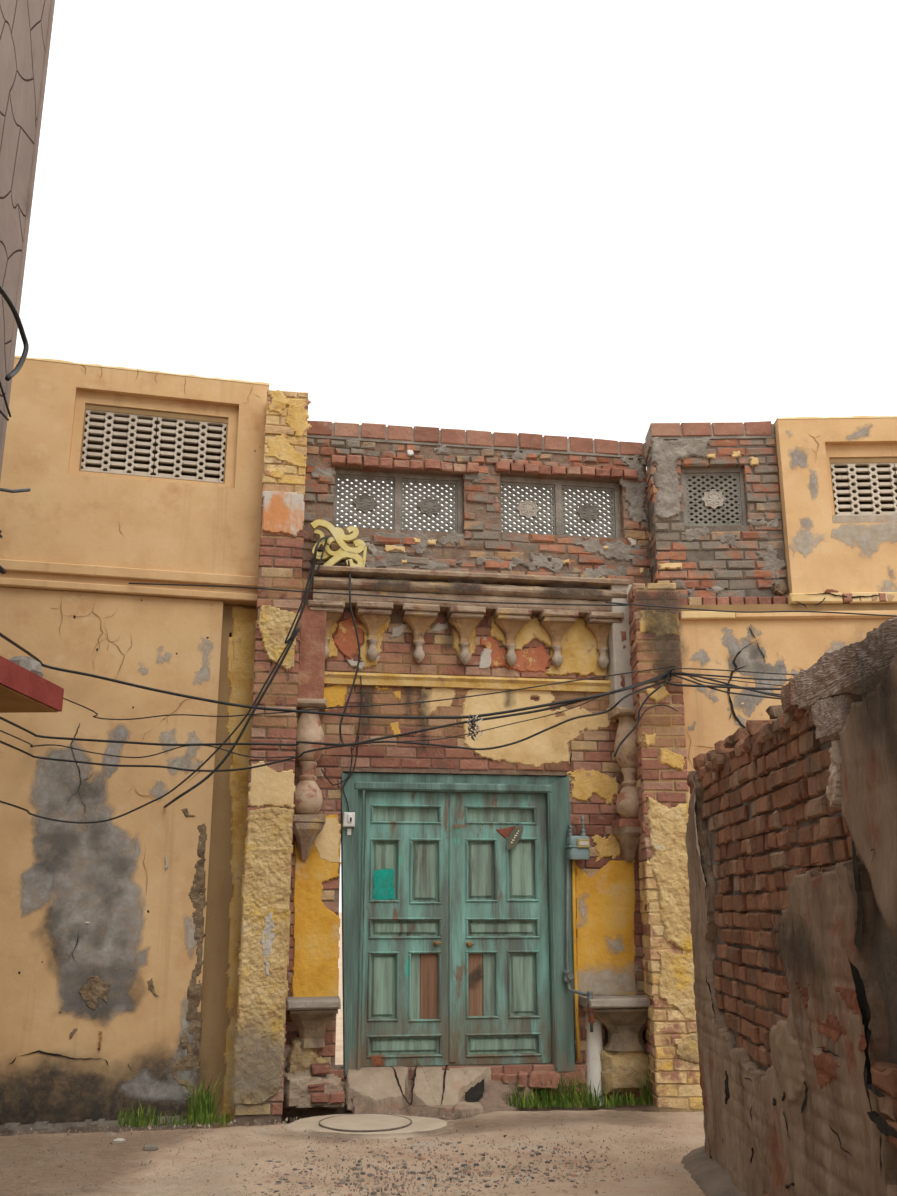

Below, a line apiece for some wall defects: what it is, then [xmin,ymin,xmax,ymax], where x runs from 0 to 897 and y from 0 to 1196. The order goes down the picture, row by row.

peeling [791,449,817,498]
crack [51,597,132,679]
peeling [693,649,710,664]
peeling [698,625,799,728]
peeling [793,515,897,557]
flaking render [824,570,897,604]
leakage [22,725,147,1021]
spalling [0,606,301,1141]
flaking render [577,712,863,1109]
crack [817,841,897,1171]